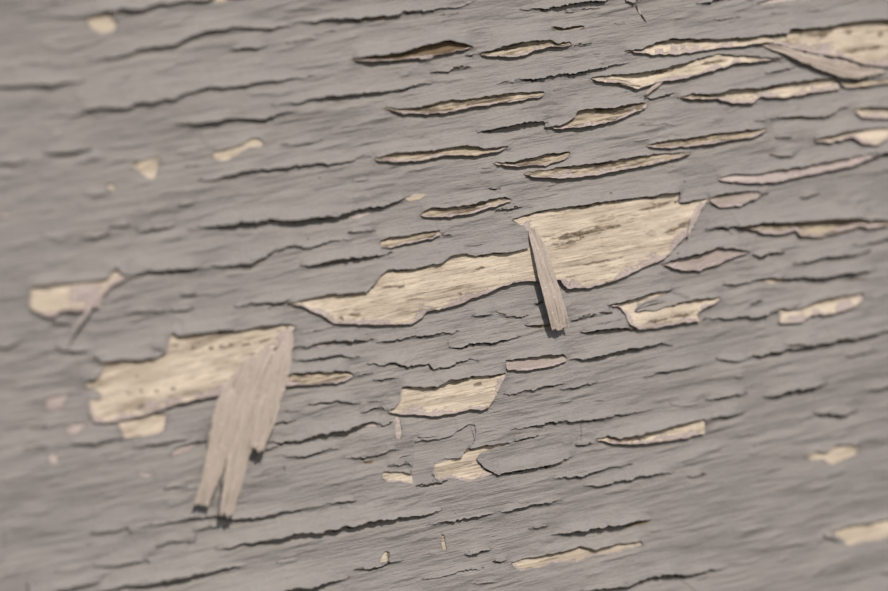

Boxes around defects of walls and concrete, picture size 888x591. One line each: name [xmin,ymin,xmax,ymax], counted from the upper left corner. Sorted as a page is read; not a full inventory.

peeling [78,10,132,34]
peeling [342,0,888,180]
peeling [16,247,204,340]
peeling [60,90,888,519]
peeling [505,525,651,573]
peeling [825,504,888,548]